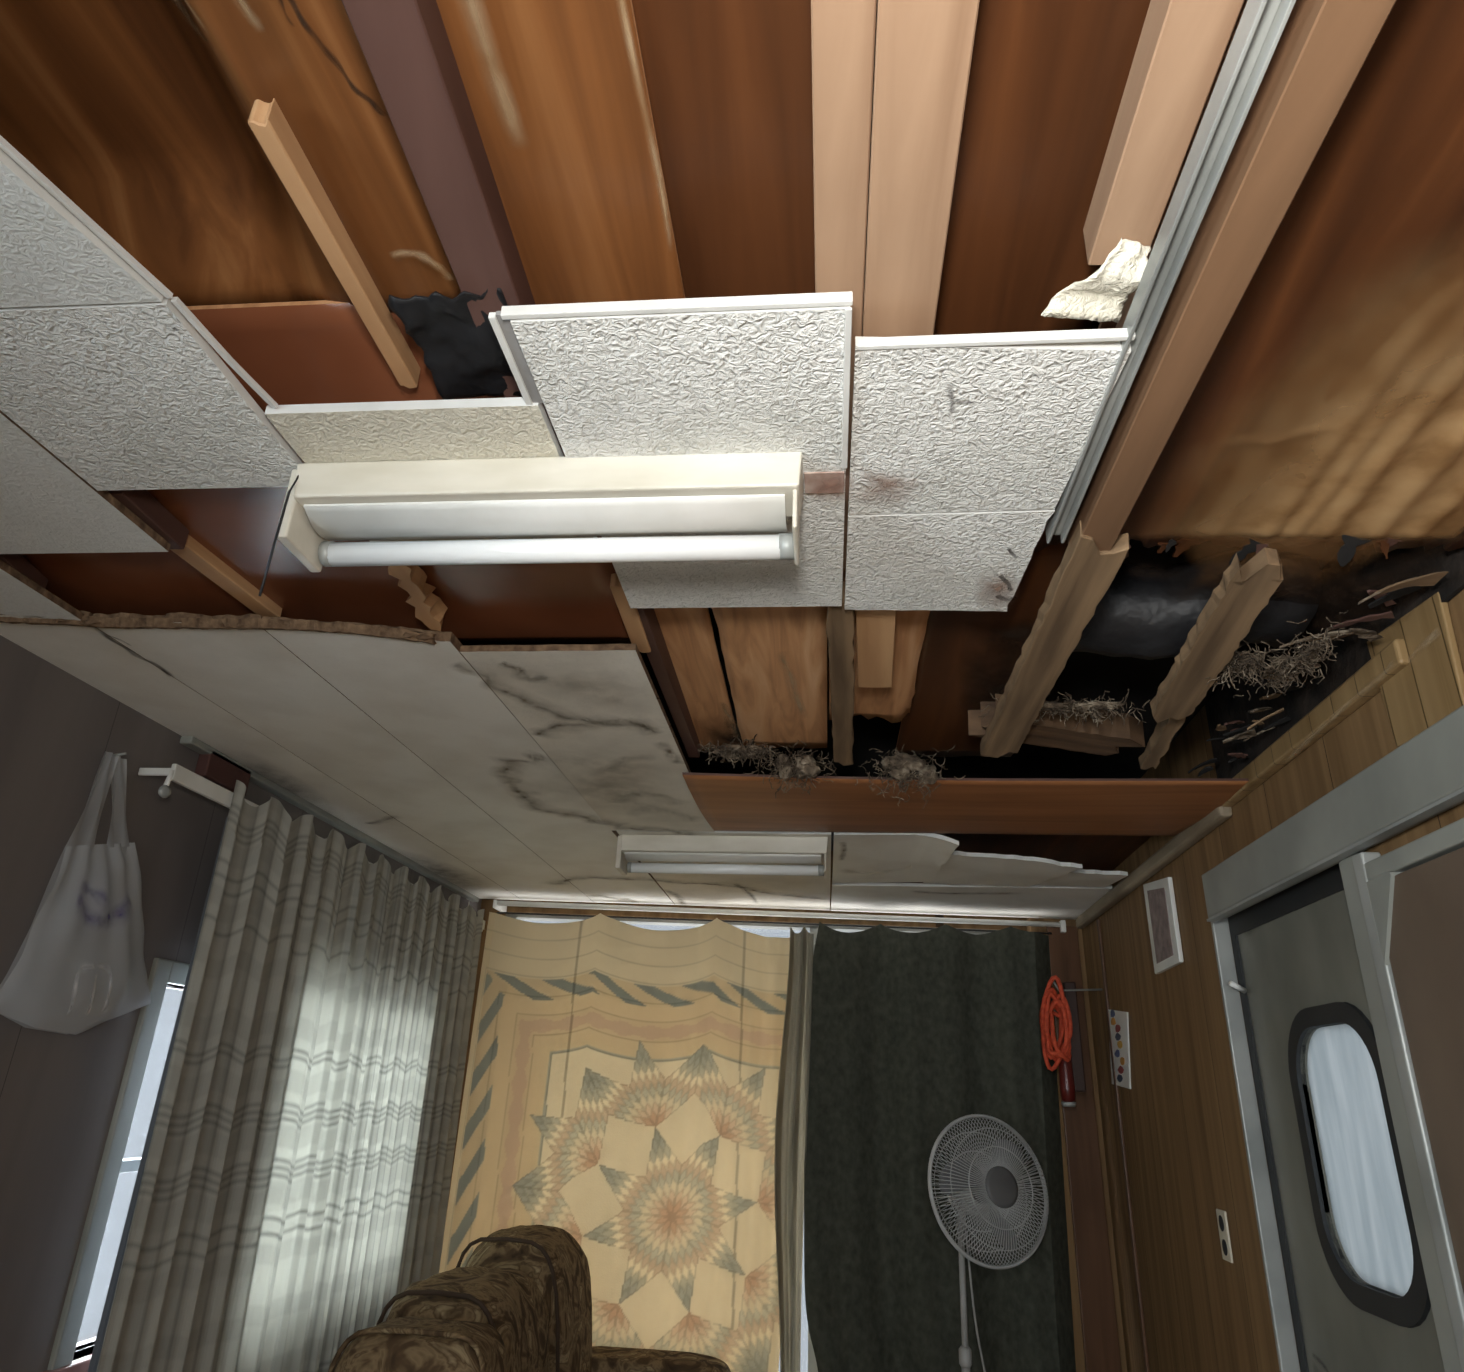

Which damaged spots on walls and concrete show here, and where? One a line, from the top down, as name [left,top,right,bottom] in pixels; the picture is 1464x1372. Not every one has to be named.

crack [280,0,381,114]
spalling [992,575,1017,599]
water stain [1269,557,1422,624]